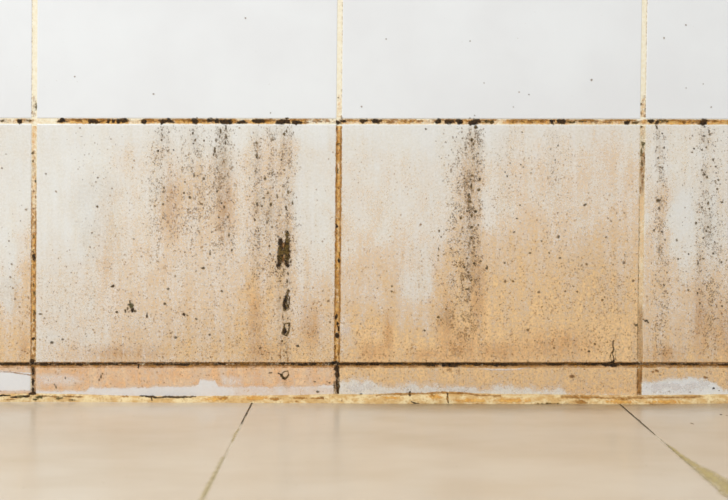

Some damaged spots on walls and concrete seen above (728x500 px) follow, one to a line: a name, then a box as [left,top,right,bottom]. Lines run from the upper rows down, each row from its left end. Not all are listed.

water stain [0,112,728,401]